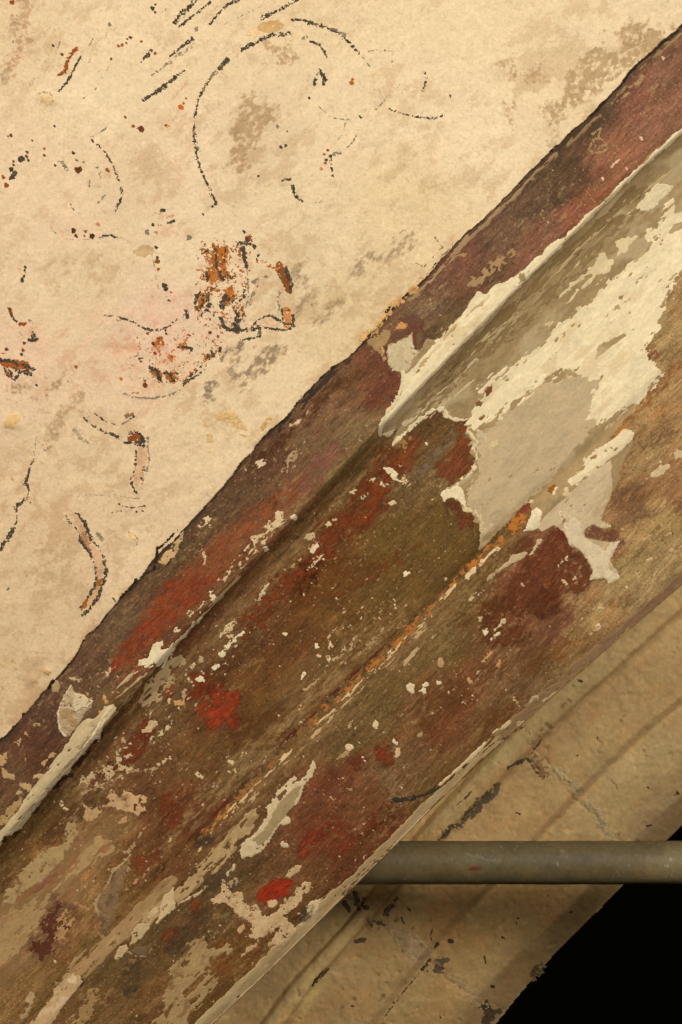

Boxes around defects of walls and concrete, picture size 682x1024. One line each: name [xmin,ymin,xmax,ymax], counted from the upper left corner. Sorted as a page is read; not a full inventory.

peeling [367,131,682,601]
peeling [349,467,411,500]
peeling [284,533,325,571]
peeling [478,616,506,667]
peeling [406,681,442,695]
peeling [0,511,298,985]
peeling [336,744,366,762]
peeling [114,760,322,1024]